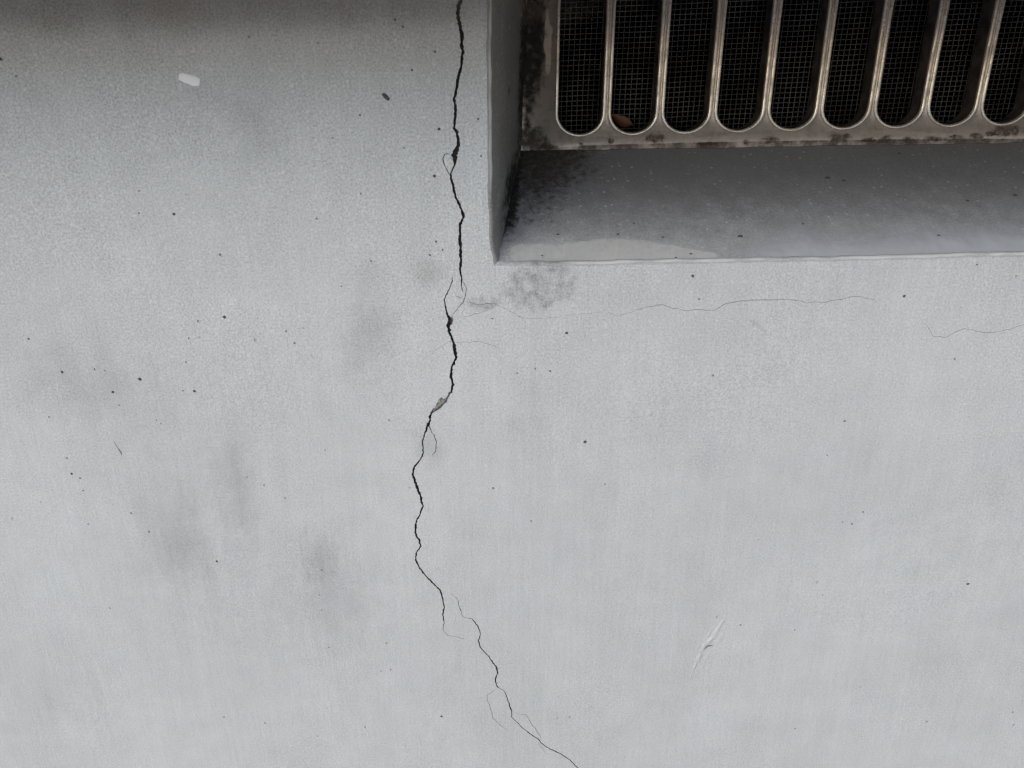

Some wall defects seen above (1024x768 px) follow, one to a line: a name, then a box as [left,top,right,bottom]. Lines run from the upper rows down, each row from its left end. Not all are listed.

water stain [503,0,585,234]
water stain [511,238,718,261]
crack [412,0,874,768]